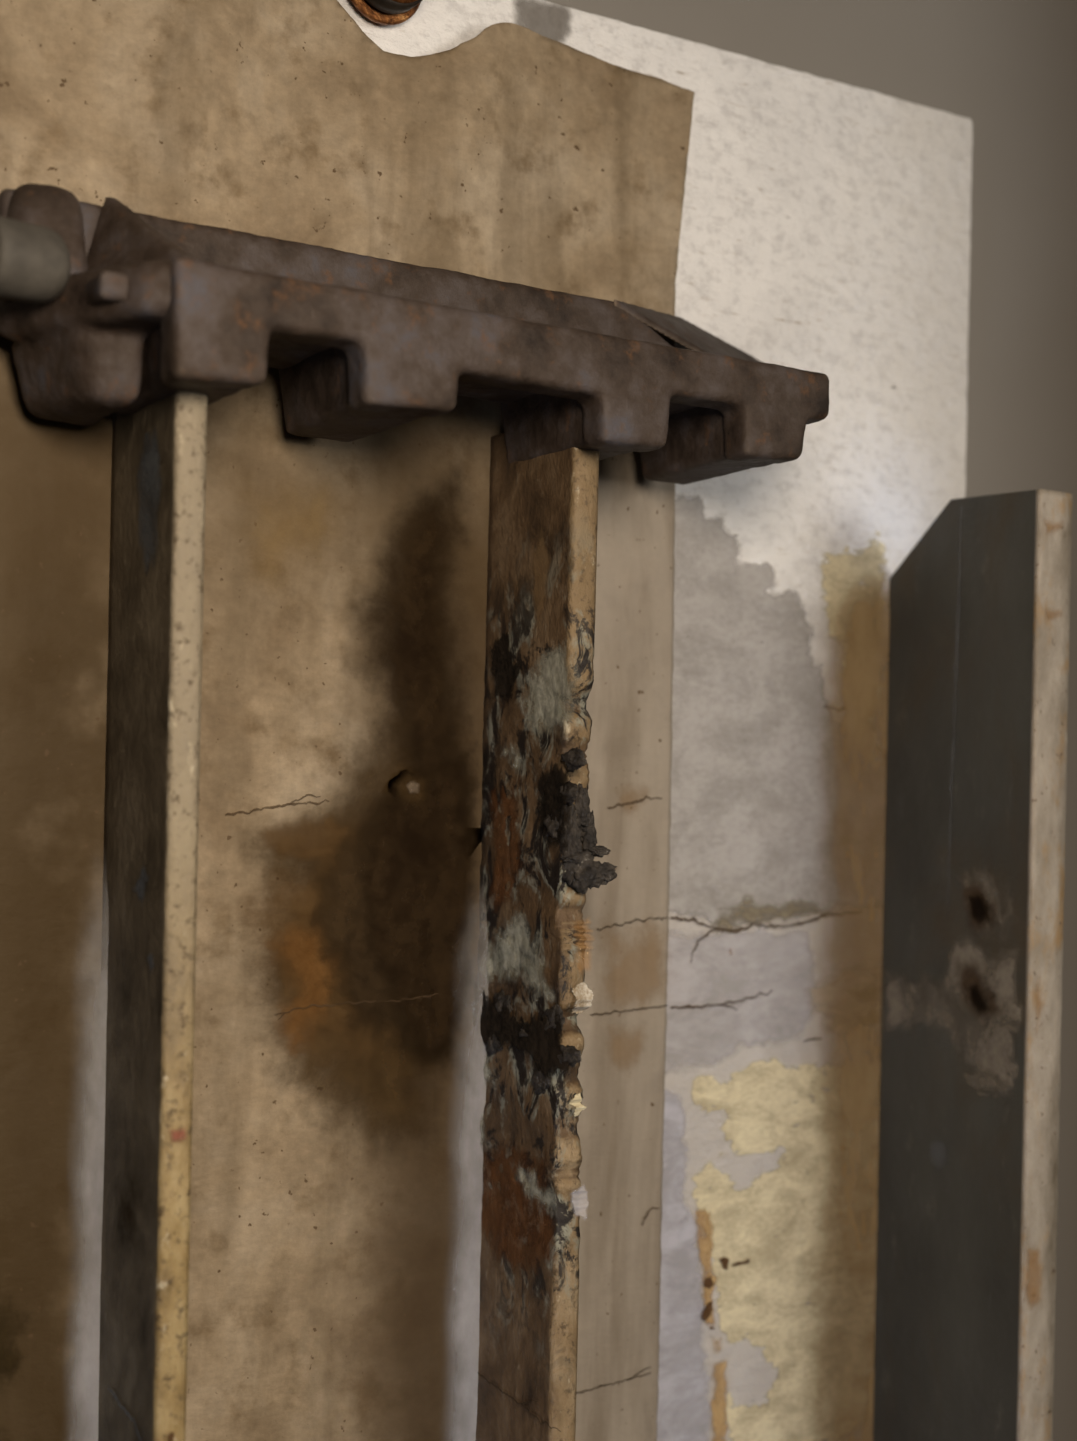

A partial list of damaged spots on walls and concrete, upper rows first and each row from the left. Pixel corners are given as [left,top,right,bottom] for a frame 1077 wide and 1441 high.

crack [225,794,329,816]
water stain [268,720,450,1137]
crack [597,912,842,963]
peeling [572,982,594,1014]
crack [590,990,772,1016]
water stain [886,873,1022,1097]
peeling [569,1093,586,1117]
corrosion [480,1119,556,1266]
peeling [691,1057,844,1441]